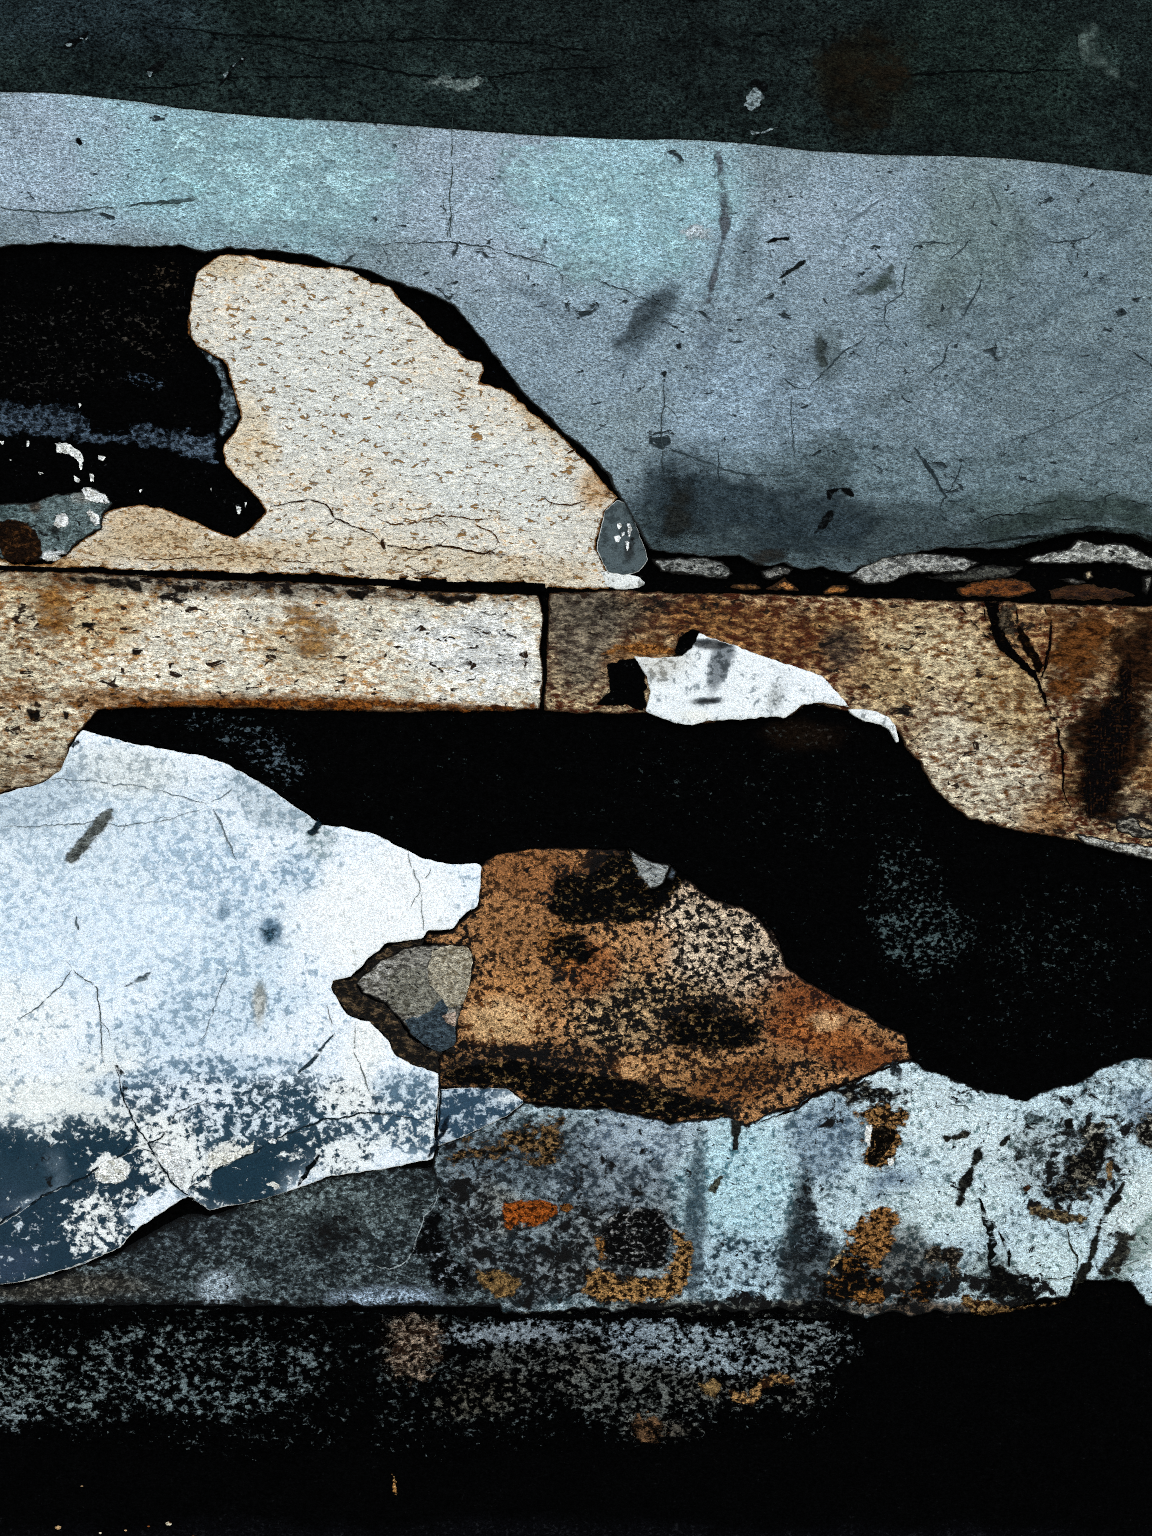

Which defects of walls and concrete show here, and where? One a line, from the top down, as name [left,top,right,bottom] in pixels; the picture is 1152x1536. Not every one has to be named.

spalling [0,254,799,591]
crack [120,499,503,576]
peeling [823,539,1152,601]
crack [914,447,1152,546]
rust [106,698,535,713]
peeling [634,633,899,743]
crack [959,604,1074,813]
rust [1046,609,1152,817]
peeling [0,730,912,1284]
crack [0,960,910,1321]
rust [830,1080,910,1172]
rust [581,1207,694,1304]